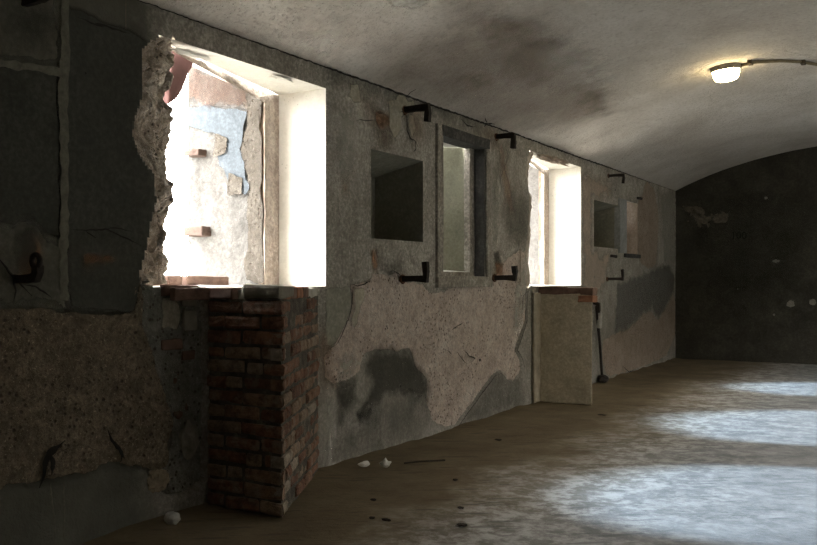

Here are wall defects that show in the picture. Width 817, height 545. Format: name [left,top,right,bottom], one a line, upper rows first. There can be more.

flaking render [170,47,264,284]
damp [615,266,674,332]
spalling [323,250,526,427]
spalling [0,284,203,493]
damp [358,353,429,419]
crack [39,440,65,488]
crack [108,430,124,461]